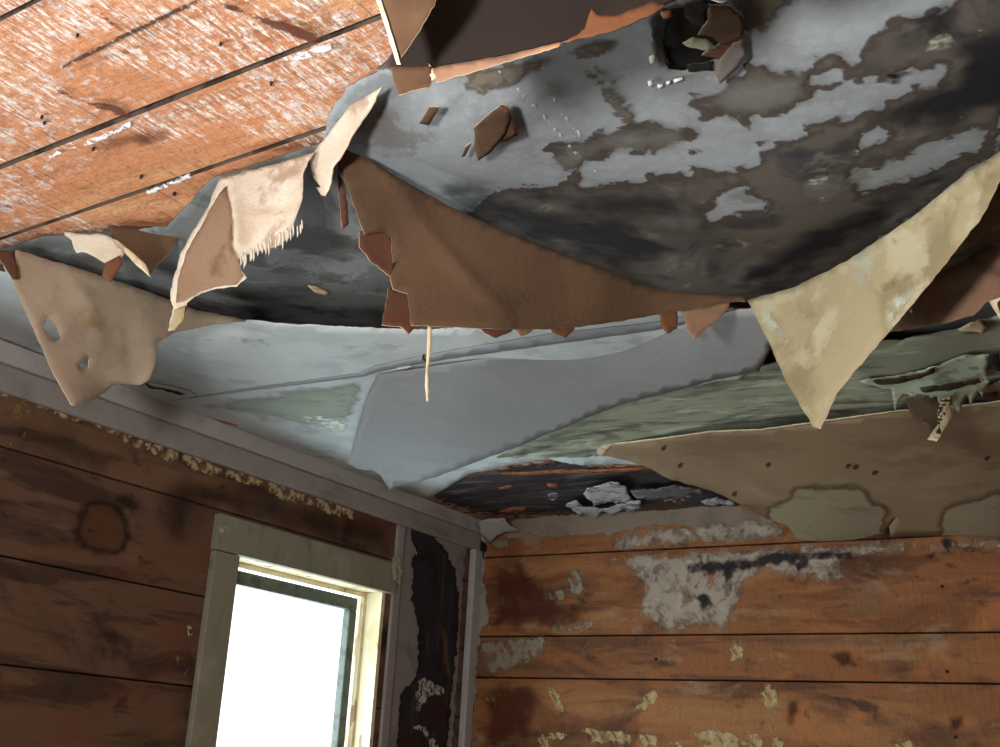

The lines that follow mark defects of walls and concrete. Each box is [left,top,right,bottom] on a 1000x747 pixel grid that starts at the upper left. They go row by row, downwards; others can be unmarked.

spalling [223,4,322,42]
flaking render [648,77,683,88]
damp [449,0,1000,308]
peeling [37,405,354,519]
peeling [389,529,459,747]
peeling [582,727,632,744]